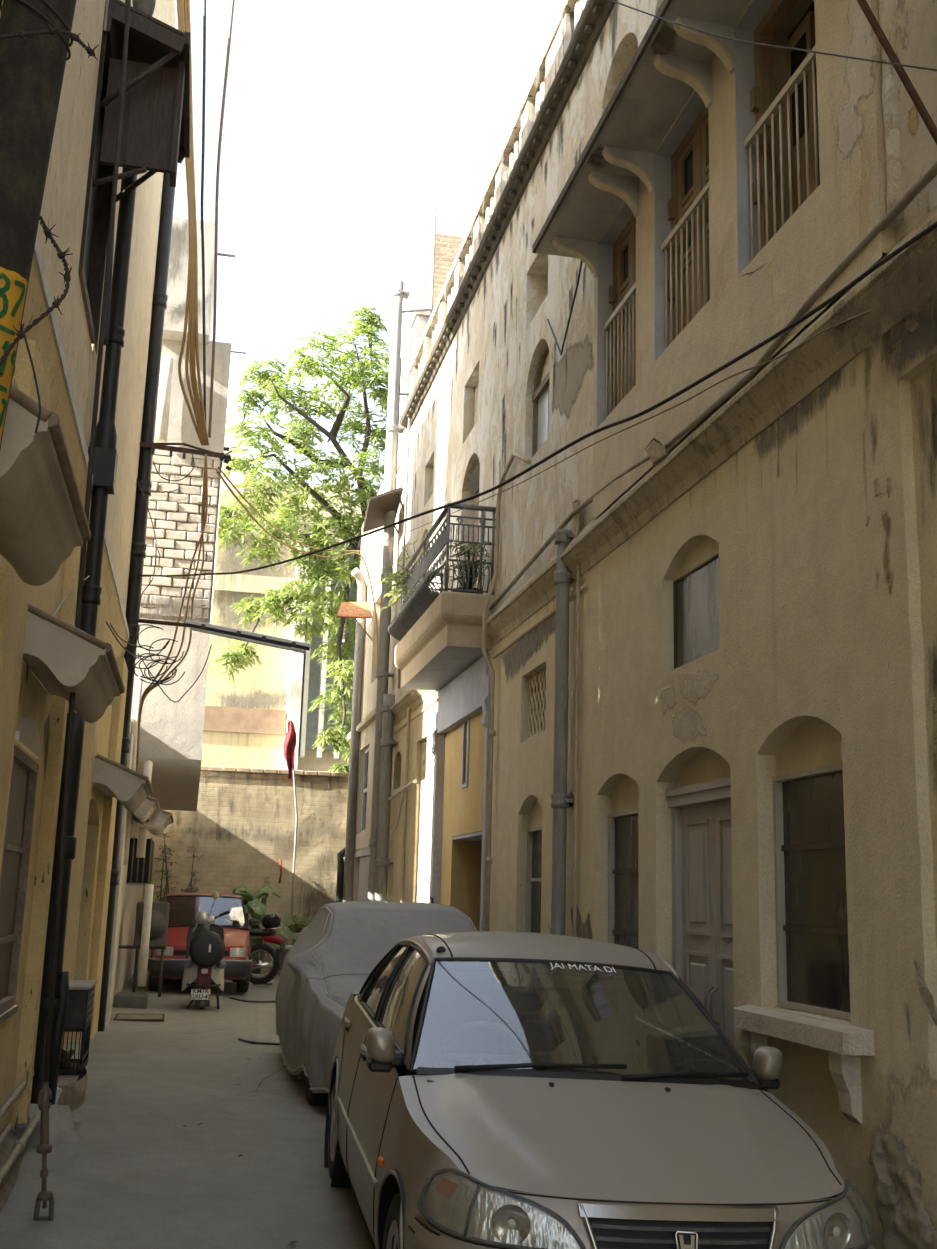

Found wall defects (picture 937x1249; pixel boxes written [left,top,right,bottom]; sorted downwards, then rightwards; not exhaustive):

peeling [896,0,937,196]
leakage [756,369,841,476]
leakage [918,379,937,495]
corrosion [877,512,892,595]
leakage [502,603,556,680]
spalling [869,1125,937,1249]